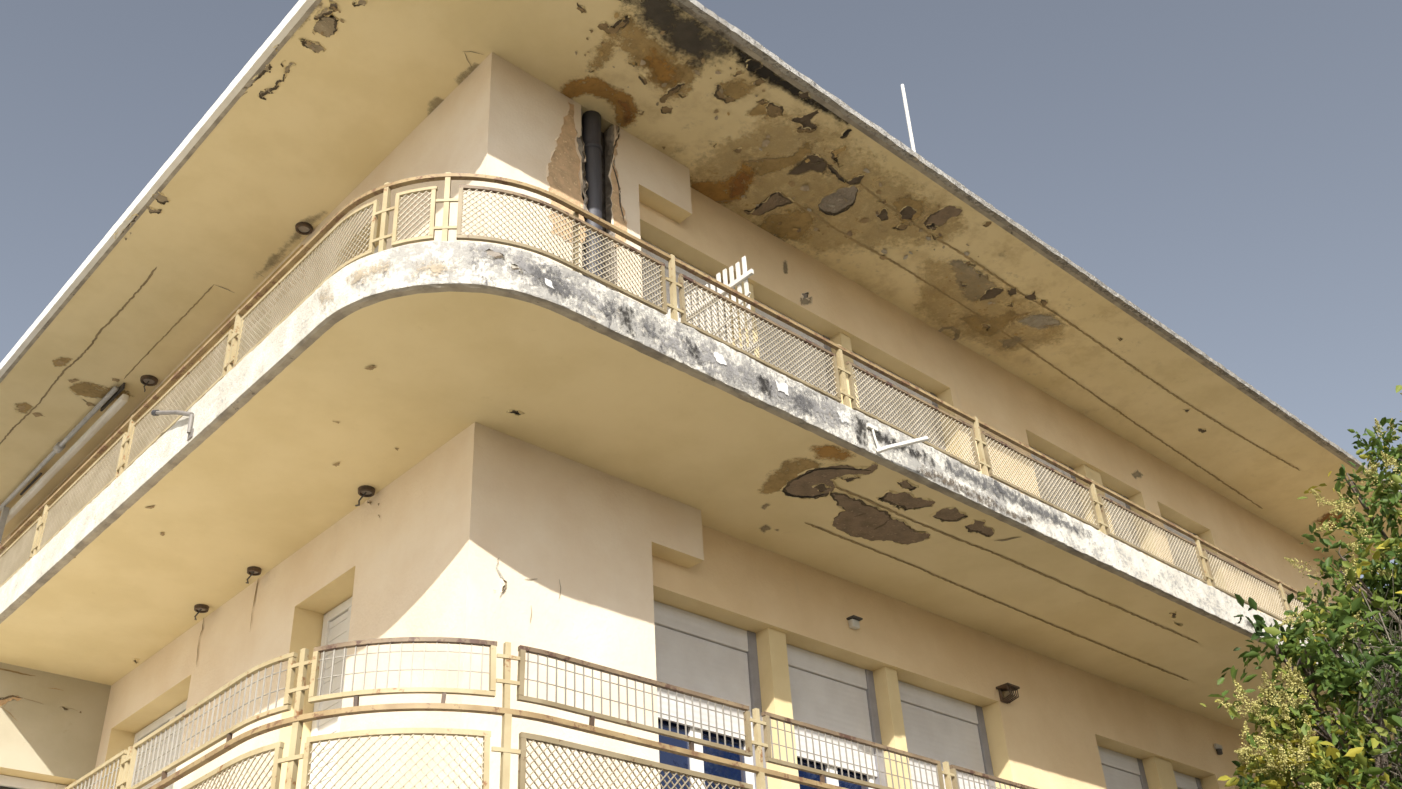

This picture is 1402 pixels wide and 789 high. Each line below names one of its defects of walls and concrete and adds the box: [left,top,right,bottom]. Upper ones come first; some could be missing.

peeling [298,0,367,53]
peeling [245,44,296,100]
leakage [575,0,849,124]
peeling [713,70,819,134]
peeling [876,196,963,240]
leakage [531,265,571,296]
peeling [950,260,1049,307]
leakage [602,301,659,342]
leakage [938,292,1060,348]
crack [0,267,157,444]
leakage [794,391,813,415]
spalling [780,462,1020,545]